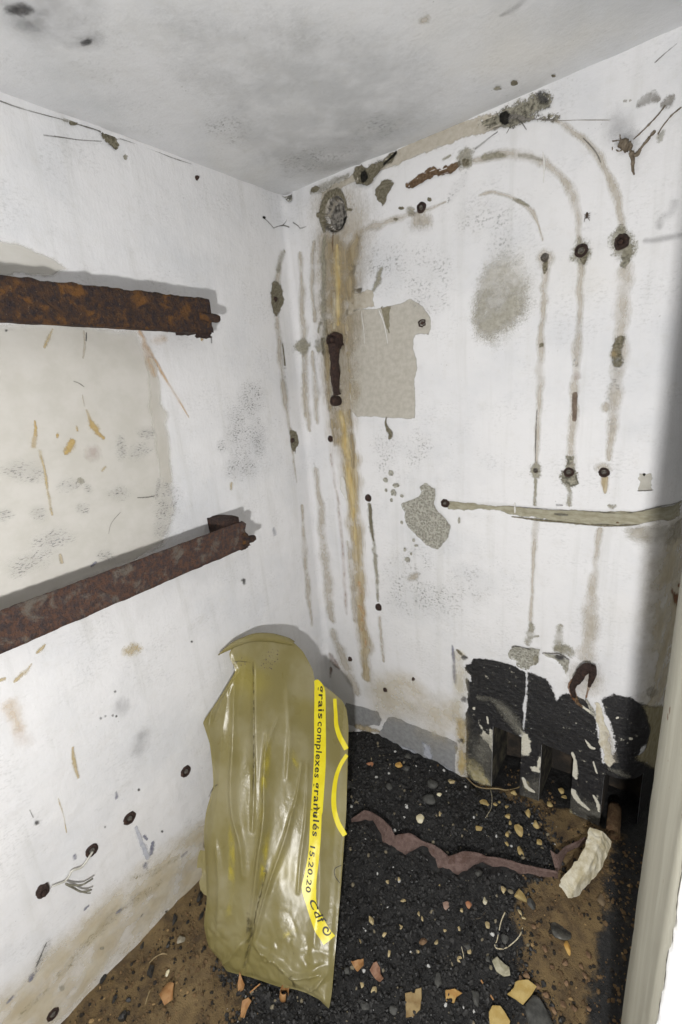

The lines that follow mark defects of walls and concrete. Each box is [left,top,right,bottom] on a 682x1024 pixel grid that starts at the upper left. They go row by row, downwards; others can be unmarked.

peeling [310,91,560,233]
peeling [345,289,431,439]
spalling [383,470,460,562]
spalling [508,645,574,675]
peeling [595,703,619,767]